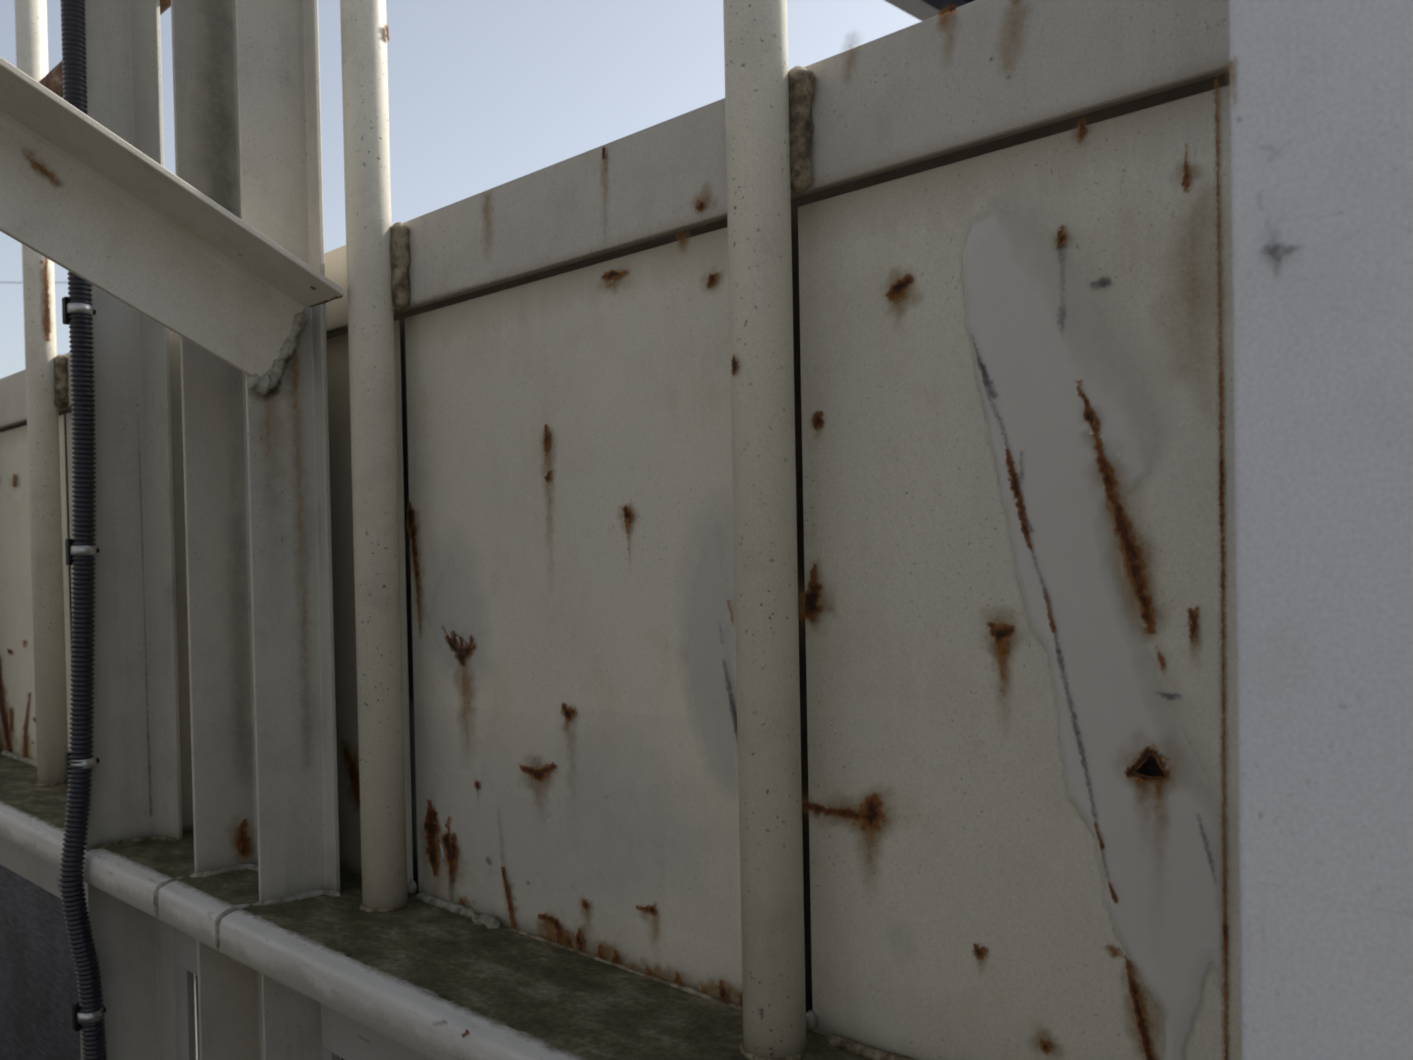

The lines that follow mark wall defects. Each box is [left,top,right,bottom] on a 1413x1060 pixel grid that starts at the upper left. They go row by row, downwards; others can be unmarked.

corrosion [40,257,51,341]
corrosion [886,274,913,304]
crack [976,350,997,397]
corrosion [543,424,552,482]
corrosion [622,505,633,550]
corrosion [1075,379,1155,634]
corrosion [800,564,825,622]
corrosion [0,640,36,758]
crack [1006,448,1118,903]
corrosion [520,762,557,804]
corrosion [538,900,684,985]
corrosion [1107,946,1156,1060]